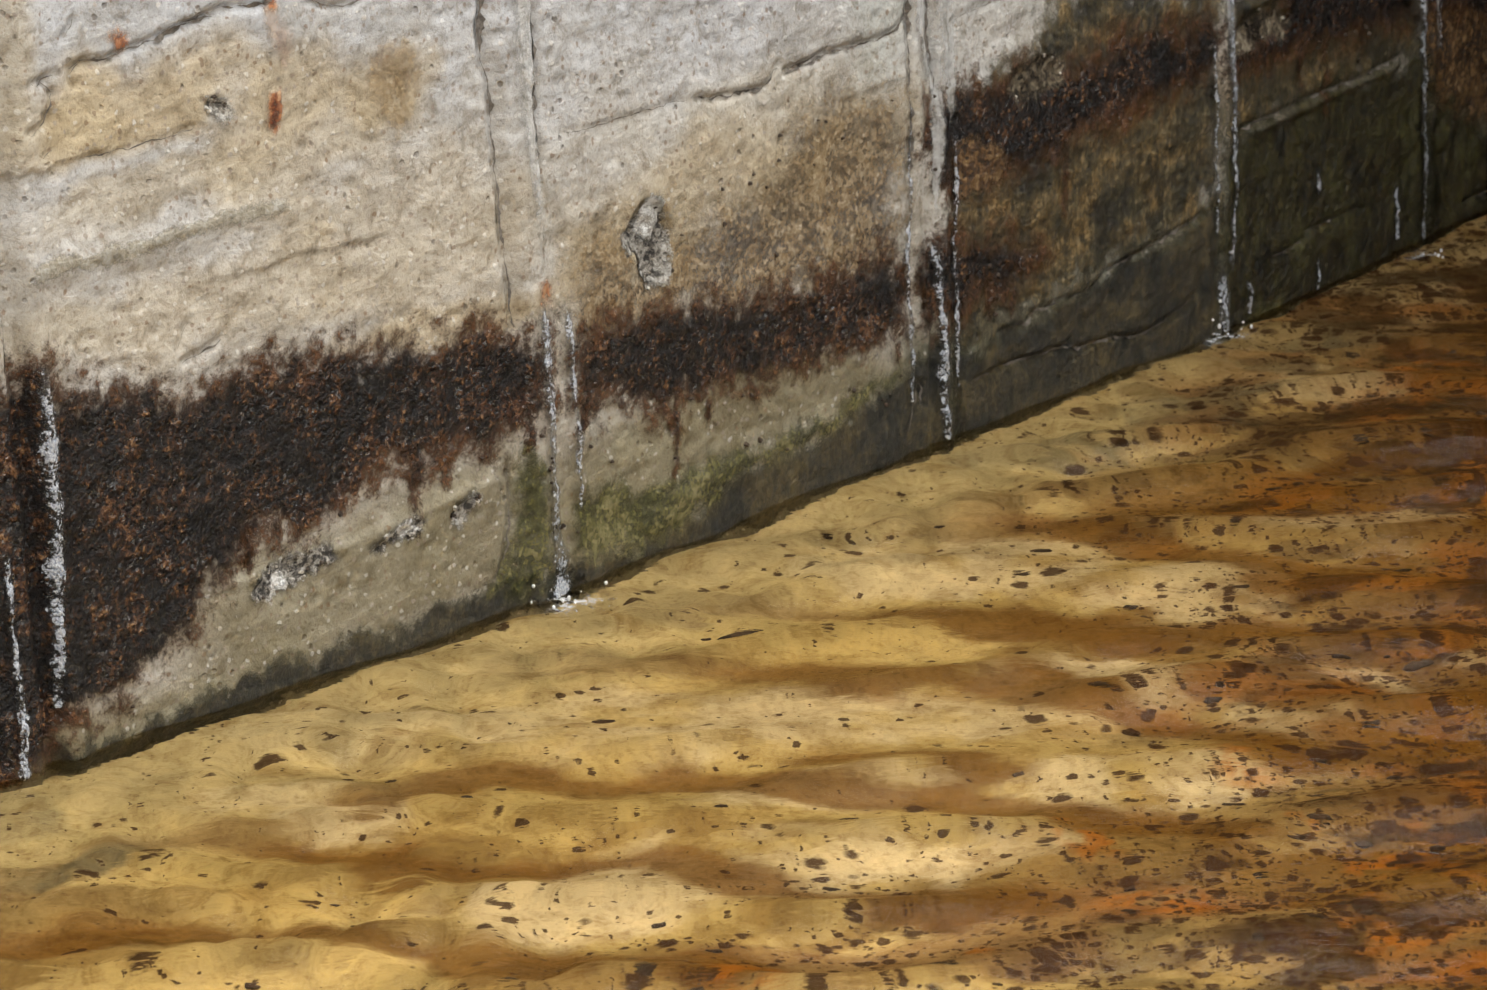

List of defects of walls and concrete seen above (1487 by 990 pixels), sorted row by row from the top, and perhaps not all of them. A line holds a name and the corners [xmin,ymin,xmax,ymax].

rust [268,90,283,134]
spalling [621,193,674,290]
leakage [0,0,1487,782]